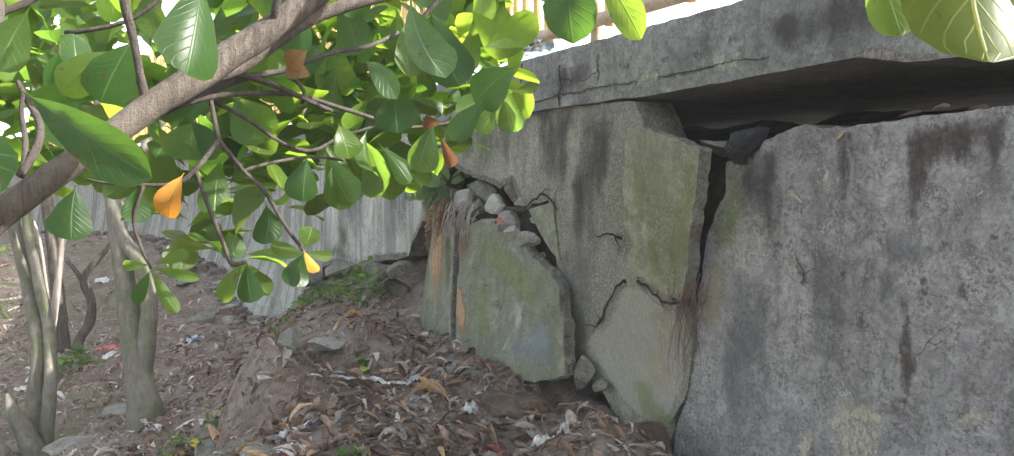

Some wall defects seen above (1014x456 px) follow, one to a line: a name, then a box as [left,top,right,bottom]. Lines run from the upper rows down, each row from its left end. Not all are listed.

crack [519,53,770,106]
spalling [852,48,937,61]
crack [525,187,558,217]
water stain [908,122,998,217]
rust [431,220,443,291]
crack [584,161,728,329]
rust [456,288,465,332]
water stain [900,304,914,389]